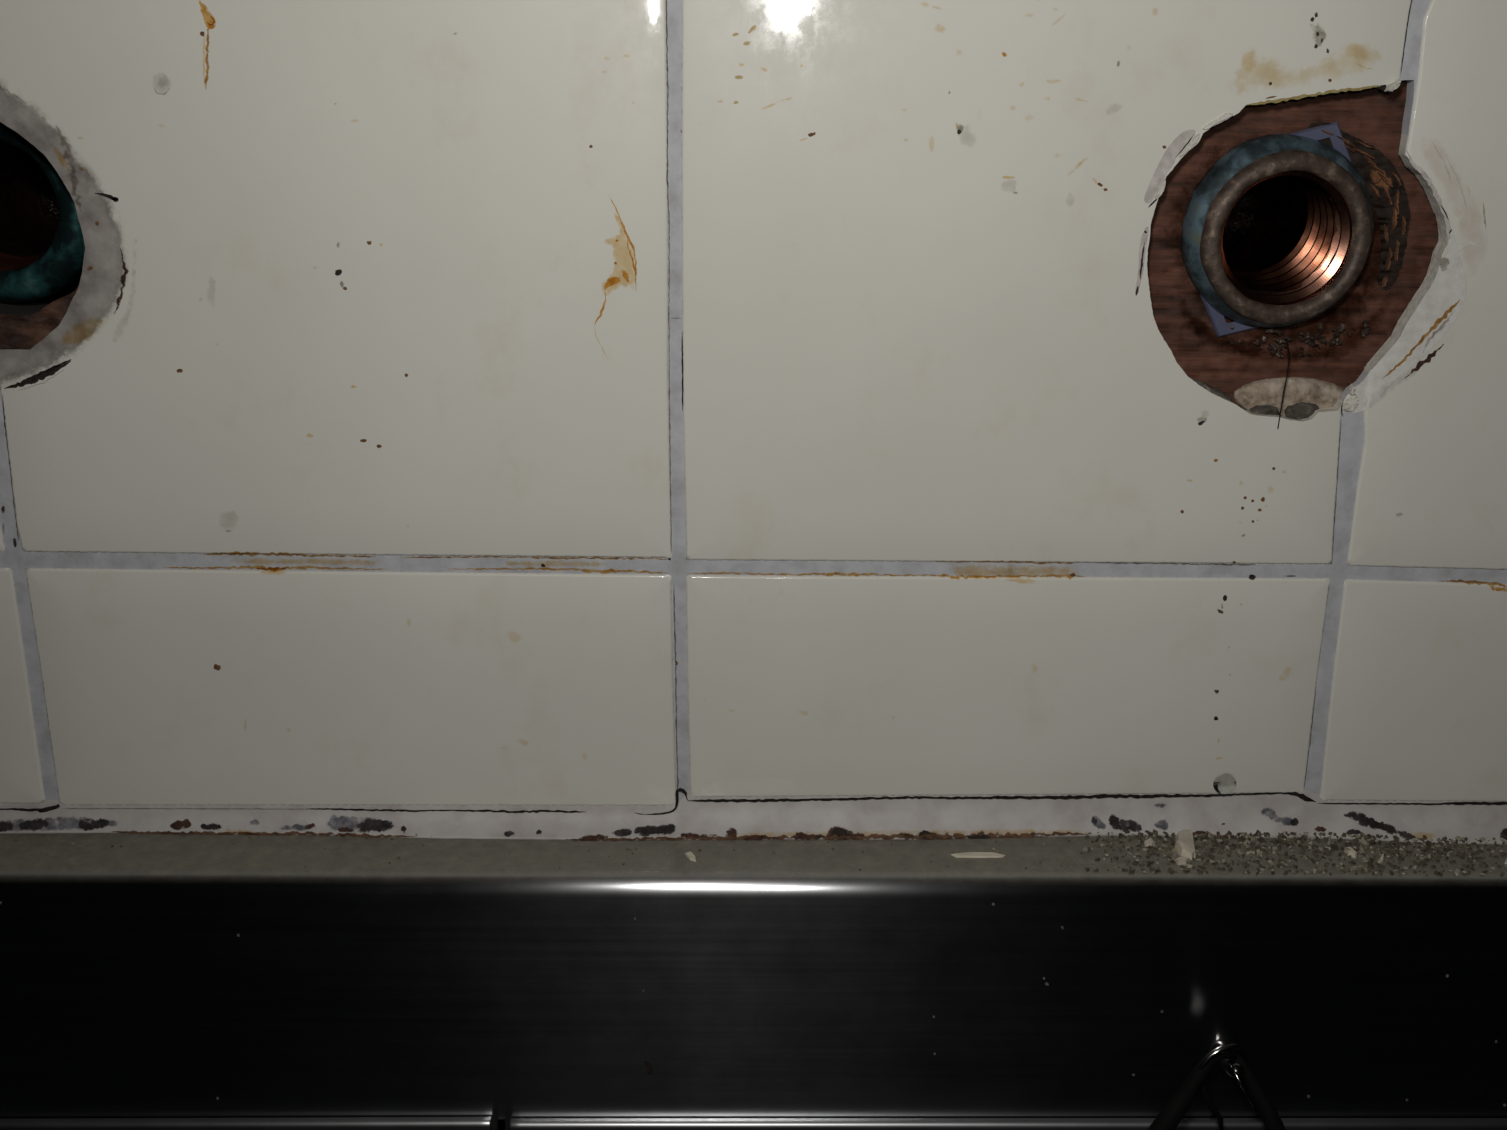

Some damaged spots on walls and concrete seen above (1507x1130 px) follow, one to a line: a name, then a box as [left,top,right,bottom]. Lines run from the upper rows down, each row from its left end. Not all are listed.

peeling [1380,79,1401,92]
spalling [1144,113,1233,208]
spalling [1135,227,1148,295]
spalling [1193,121,1467,420]
spalling [33,278,80,303]
rust [205,552,375,569]
water stain [170,819,221,830]
water stain [338,818,406,833]
water stain [579,824,768,841]
water stain [795,827,864,841]
water stain [1092,805,1167,832]
water stain [1344,812,1415,839]